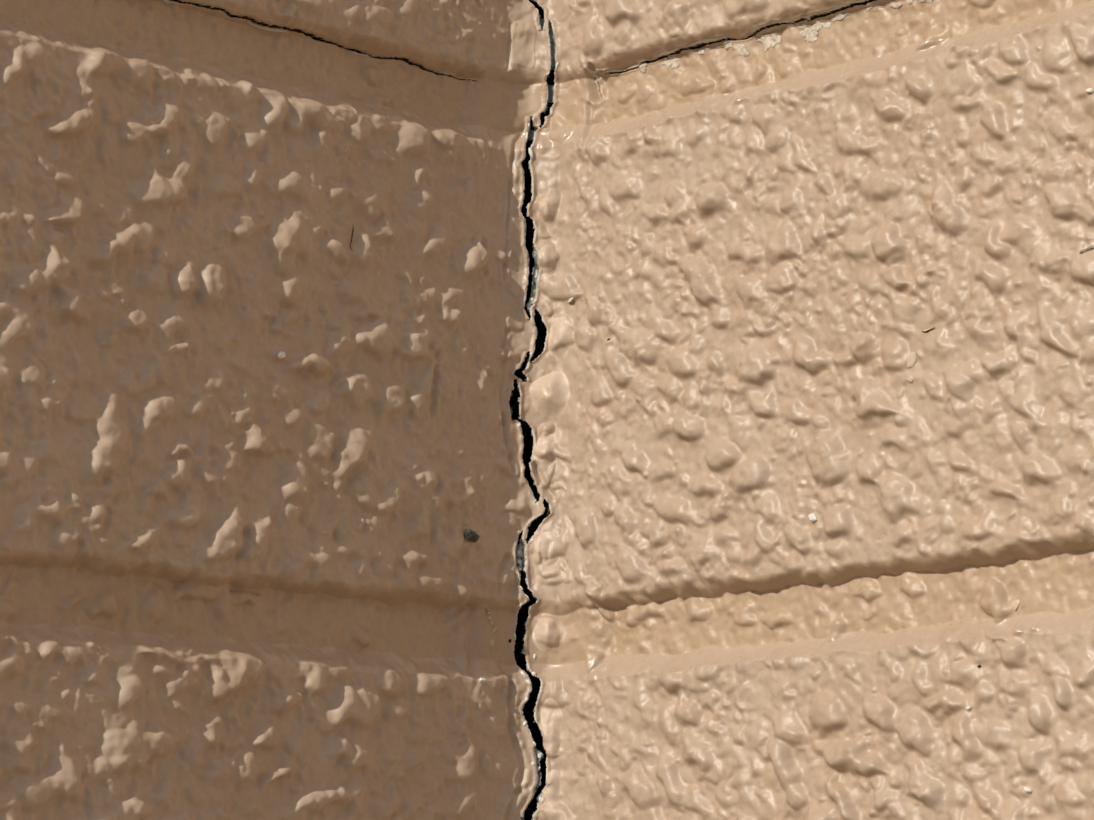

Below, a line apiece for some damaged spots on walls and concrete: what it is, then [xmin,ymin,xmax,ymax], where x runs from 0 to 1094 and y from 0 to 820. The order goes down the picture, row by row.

crack [164,0,475,81]
crack [603,0,876,74]
crack [509,0,559,820]